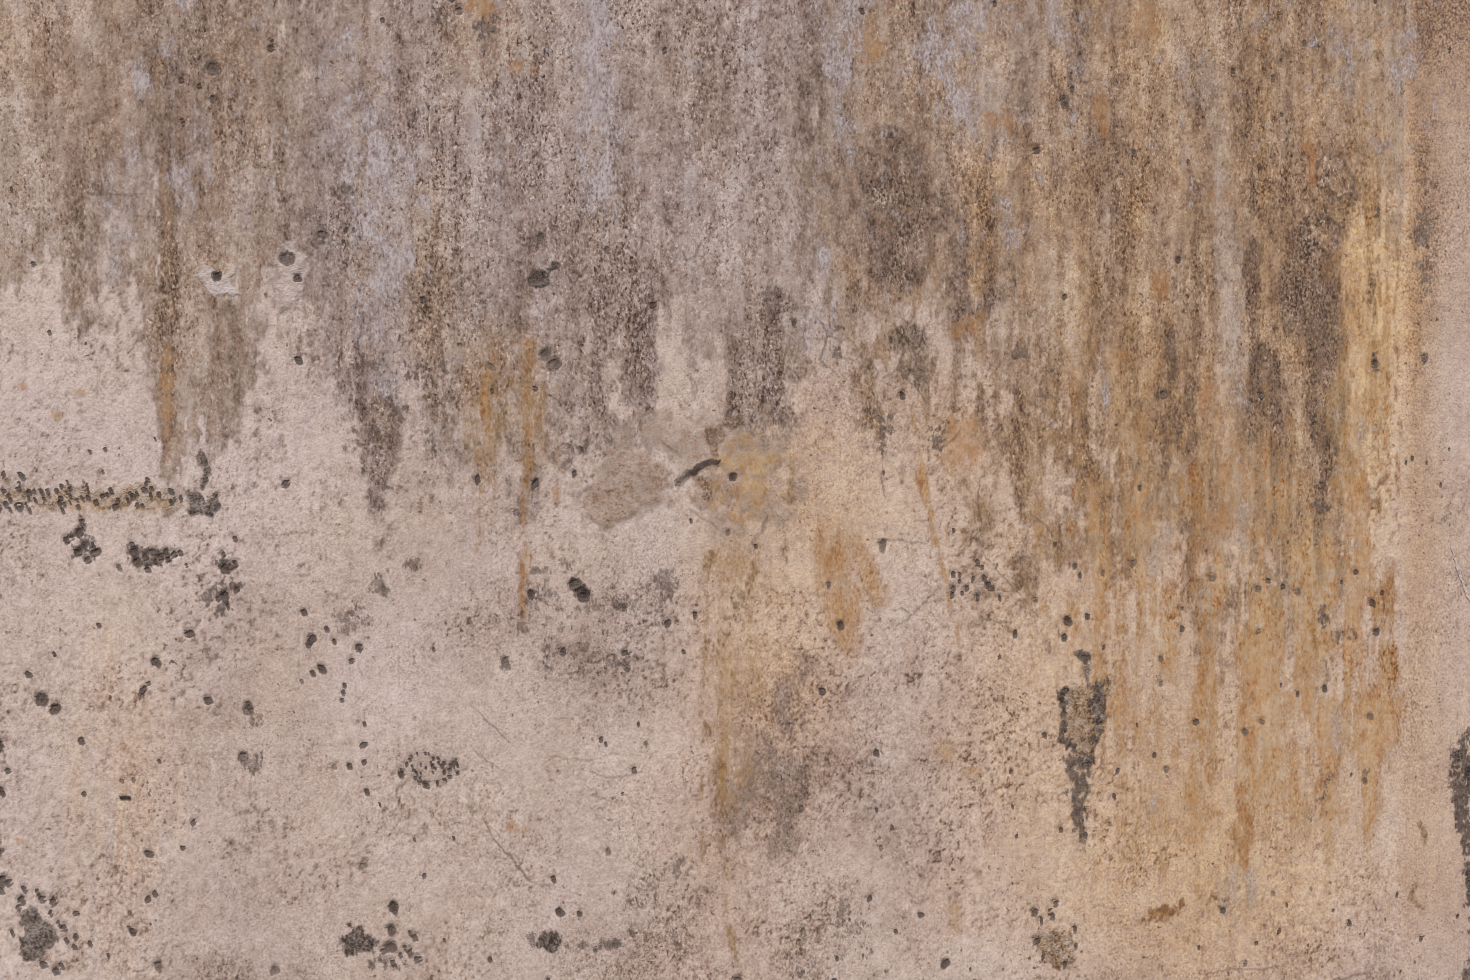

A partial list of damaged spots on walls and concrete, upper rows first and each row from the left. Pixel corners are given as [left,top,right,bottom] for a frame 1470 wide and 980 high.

leakage [0,0,1416,684]
corrosion [815,535,884,647]
corrosion [916,462,938,544]
corrosion [1067,303,1402,868]